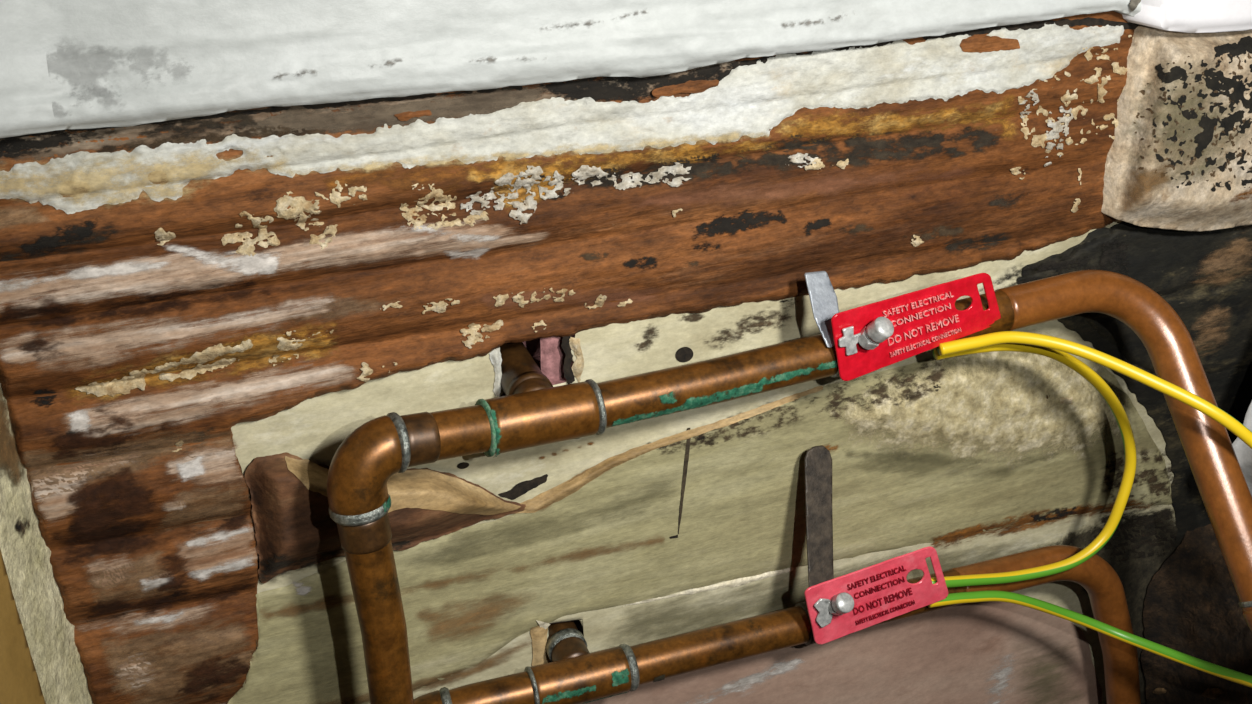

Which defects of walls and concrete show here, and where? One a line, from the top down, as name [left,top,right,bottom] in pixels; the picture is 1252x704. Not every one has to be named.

flaking render [1050,11,1128,23]
leakage [0,61,741,203]
corrosion [325,96,1014,207]
leakage [482,127,1000,200]
mould [1134,36,1252,192]
leakage [0,221,117,262]
corrosion [484,290,658,309]
mould [0,389,24,486]
corrosion [932,500,1149,547]
flaking render [147,634,199,657]
spalling [530,619,584,666]
flaking render [162,670,249,704]